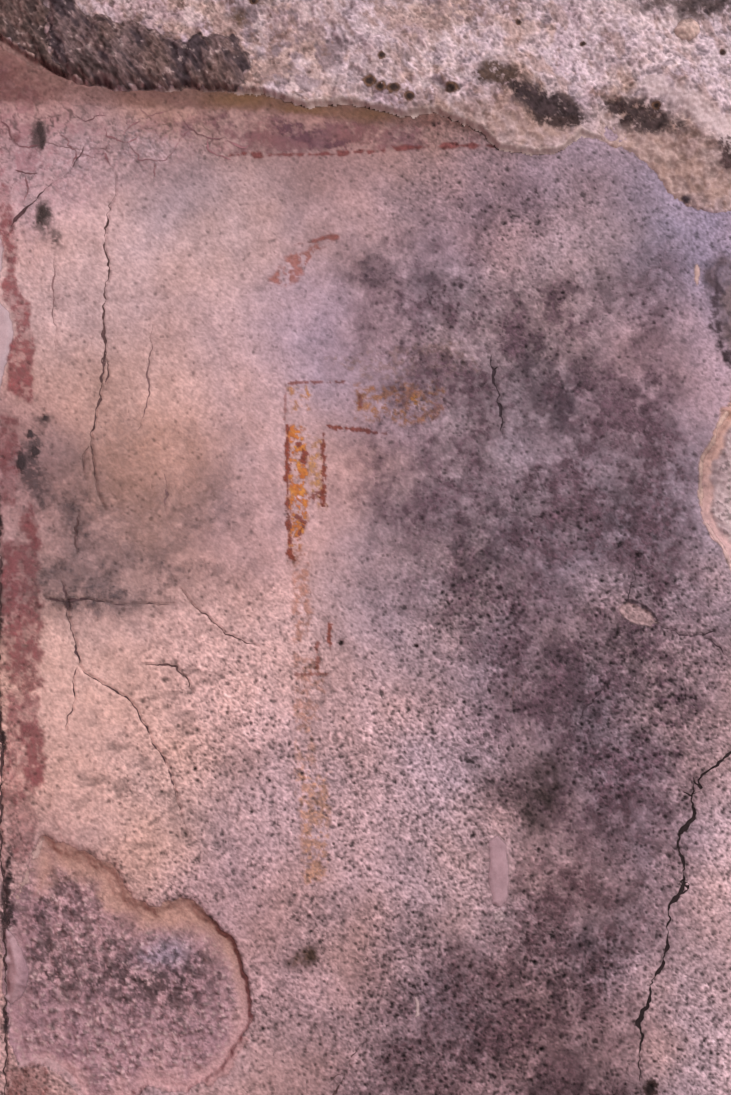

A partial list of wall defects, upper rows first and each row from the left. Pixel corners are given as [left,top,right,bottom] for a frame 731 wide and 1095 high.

flaking render [0,0,731,213]
peeling [0,207,34,401]
crack [1,110,251,549]
peeling [695,259,731,365]
peeling [2,509,45,804]
crack [46,581,259,817]
leakage [351,257,706,845]
spalling [698,404,731,570]
spalling [1,827,253,1095]
leakage [288,946,318,966]
leakage [354,857,662,1095]
crack [635,751,731,1080]